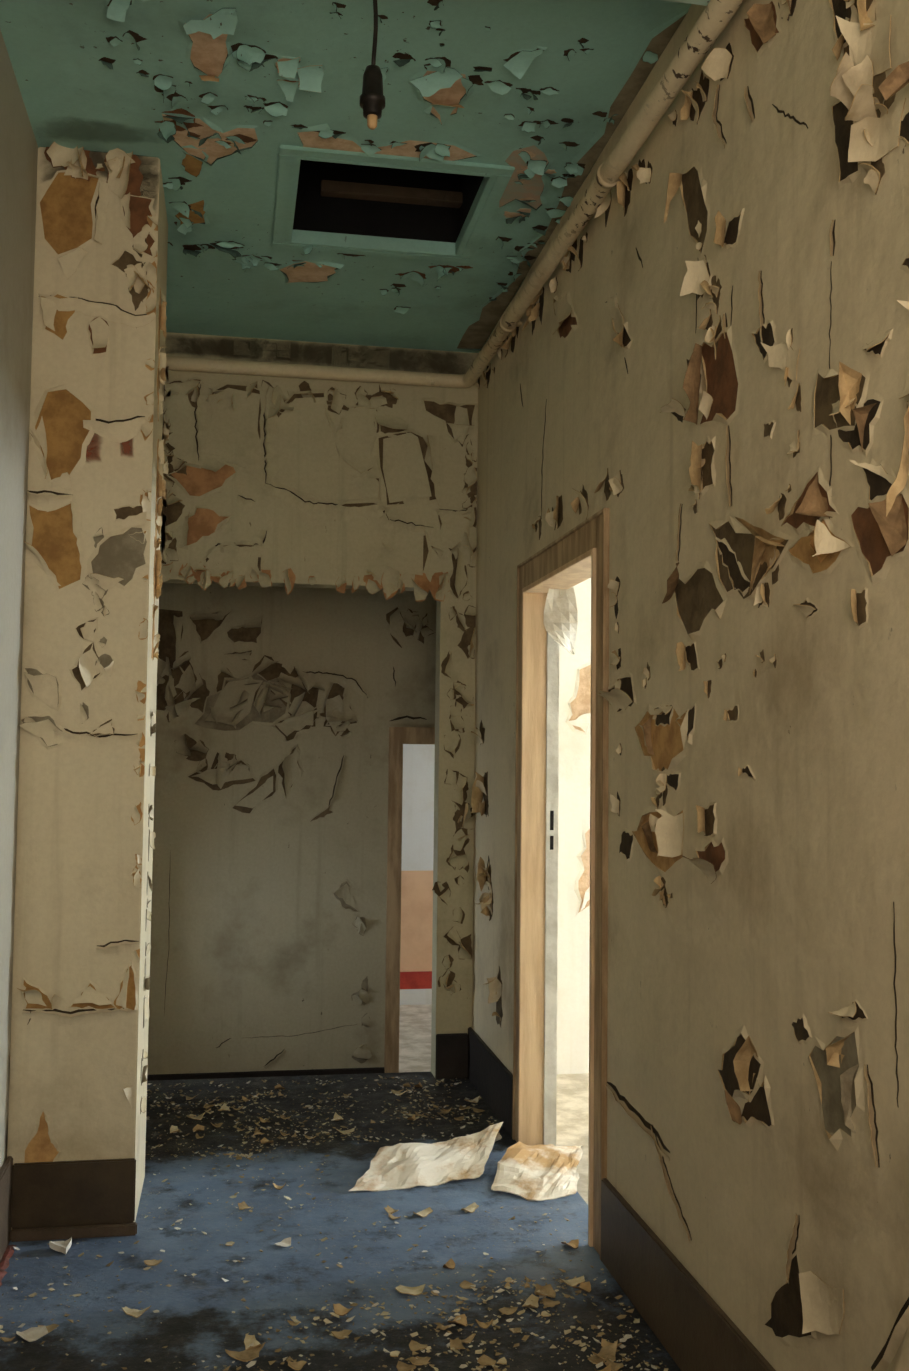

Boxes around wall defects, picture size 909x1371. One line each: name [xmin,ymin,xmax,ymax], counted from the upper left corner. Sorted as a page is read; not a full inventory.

peeling [668,43,734,127]
peeling [828,0,909,195]
peeling [19,0,689,995]
peeling [17,802,156,1028]
peeling [485,966,503,1027]
peeling [123,1049,148,1114]
crack [605,1082,692,1241]
peeling [716,1025,775,1130]
peeling [791,999,880,1168]